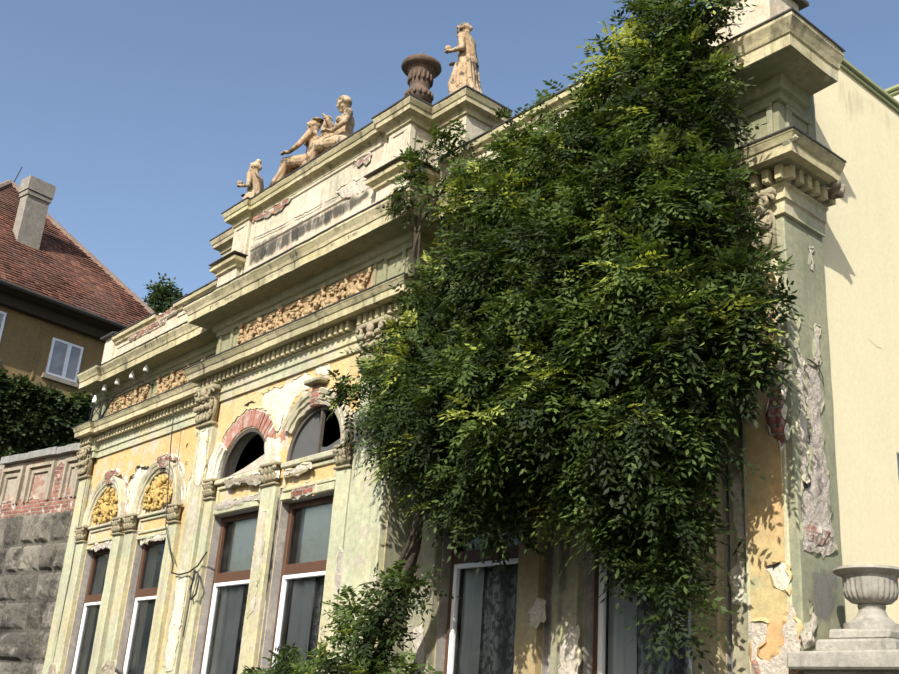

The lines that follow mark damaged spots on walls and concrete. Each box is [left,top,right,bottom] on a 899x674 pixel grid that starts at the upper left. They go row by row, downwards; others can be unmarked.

peeling [213,362,332,619]
peeling [728,471,747,606]
spalling [765,316,838,559]
peeling [165,576,187,672]
peeling [527,597,547,629]
peeling [556,621,582,674]
spalling [748,560,818,674]